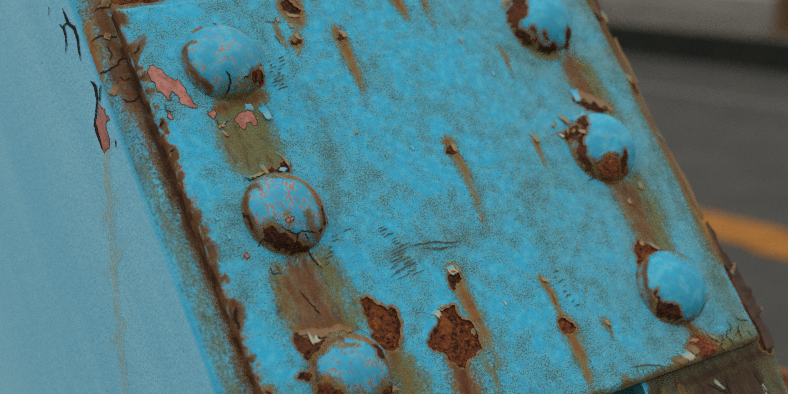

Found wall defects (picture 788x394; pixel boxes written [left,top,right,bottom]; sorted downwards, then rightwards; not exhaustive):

crack [95,0,112,11]
corrosion [265,0,307,57]
corrosion [388,0,411,20]
crack [48,7,140,153]
peeling [147,65,198,120]
peeling [207,103,273,137]
corrosion [83,0,278,394]
corrosion [181,24,435,394]
corrosion [441,136,485,219]
corrosion [499,0,774,394]
corrosion [426,261,503,394]